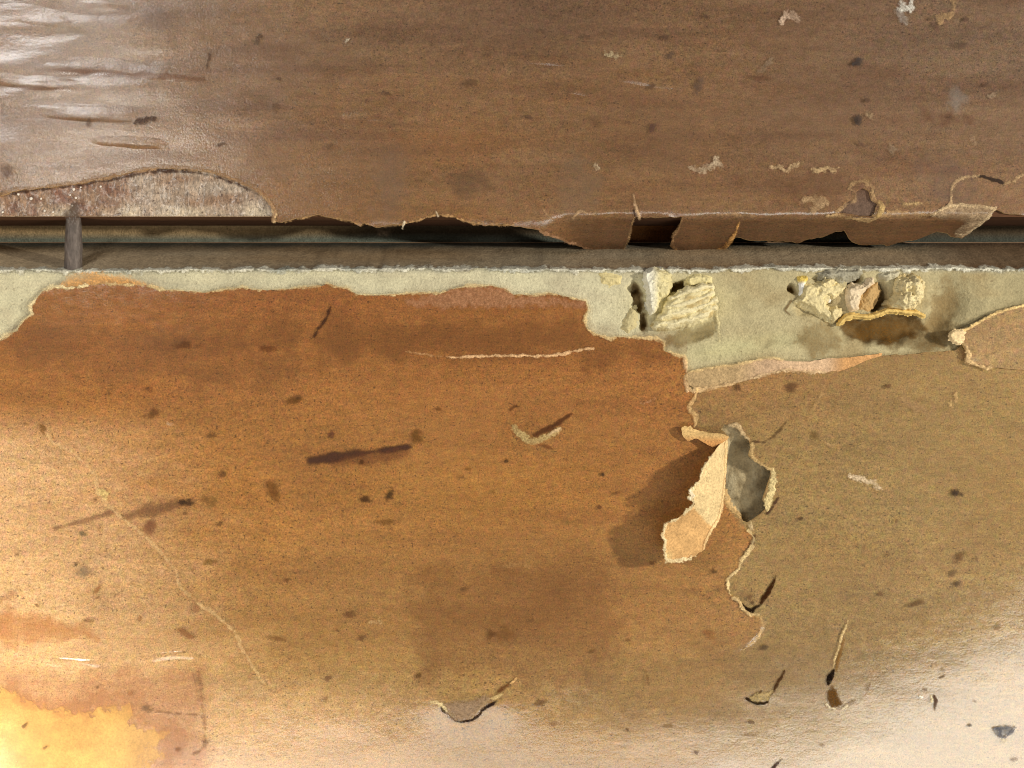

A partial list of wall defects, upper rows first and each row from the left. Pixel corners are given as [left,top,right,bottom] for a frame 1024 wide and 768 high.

peeling [0,165,277,223]
flaking render [620,266,720,346]
flaking render [784,266,939,346]
peeling [661,426,729,563]
crack [732,577,776,616]
water stain [0,687,180,768]